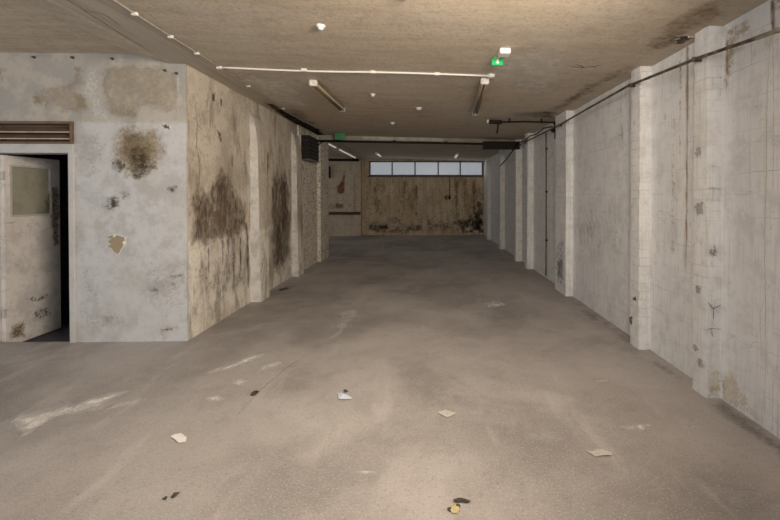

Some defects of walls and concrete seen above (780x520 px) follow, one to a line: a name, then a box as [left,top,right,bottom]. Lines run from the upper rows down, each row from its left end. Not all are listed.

peeling [103,67,176,116]
damp [112,129,161,179]
peeling [107,234,126,254]
damp [193,173,249,287]
damp [272,176,289,274]